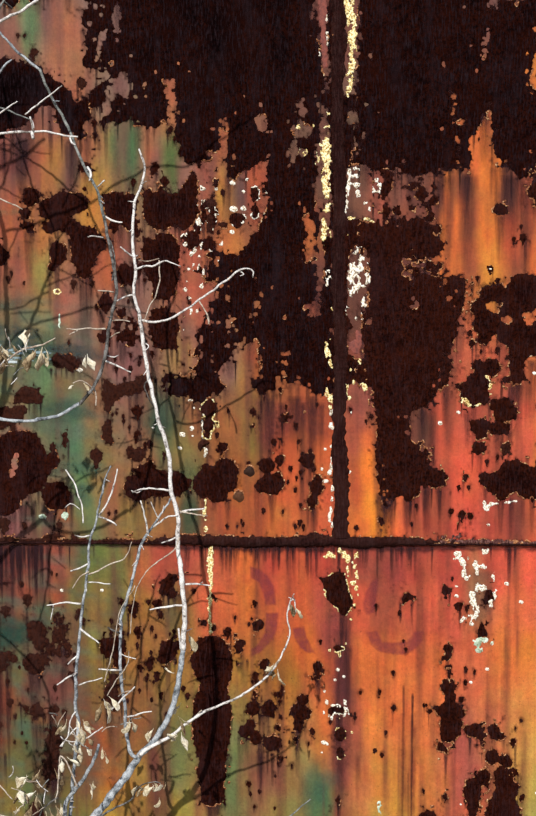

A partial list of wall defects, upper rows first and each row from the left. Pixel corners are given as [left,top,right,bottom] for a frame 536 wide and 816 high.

corrosion [0,0,536,585]
corrosion [0,602,90,788]
corrosion [98,572,189,717]
corrosion [181,600,316,808]
corrosion [308,661,325,693]
corrosion [319,569,356,657]
corrosion [328,704,357,760]
corrosion [398,592,417,617]
corrosion [442,576,470,623]
corrosion [412,641,525,816]
corrosion [477,620,494,641]
corrosion [479,582,494,608]